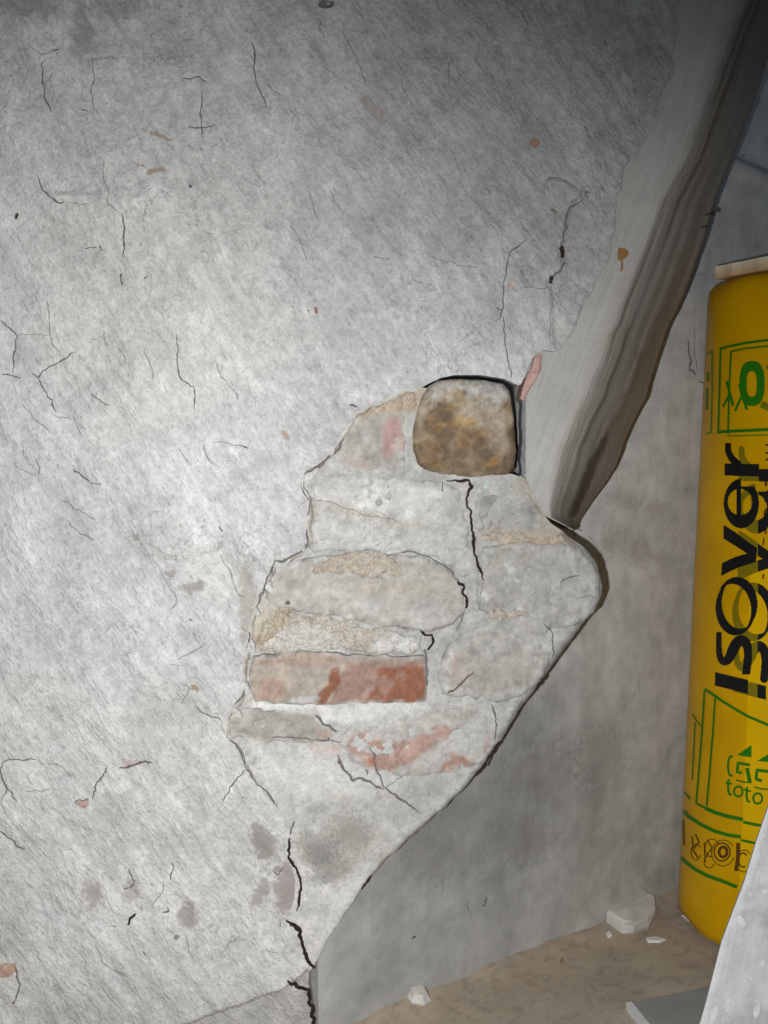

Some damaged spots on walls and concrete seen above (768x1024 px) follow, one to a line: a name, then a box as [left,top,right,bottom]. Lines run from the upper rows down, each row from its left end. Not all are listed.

crack [41,49,58,113]
crack [183,76,214,139]
crack [252,43,266,106]
crack [37,175,64,204]
crack [84,215,147,285]
crack [0,320,74,414]
crack [176,335,196,409]
spalling [226,387,419,736]
crack [397,479,483,694]
crack [472,705,500,779]
crack [272,714,419,852]
crack [195,690,316,1024]